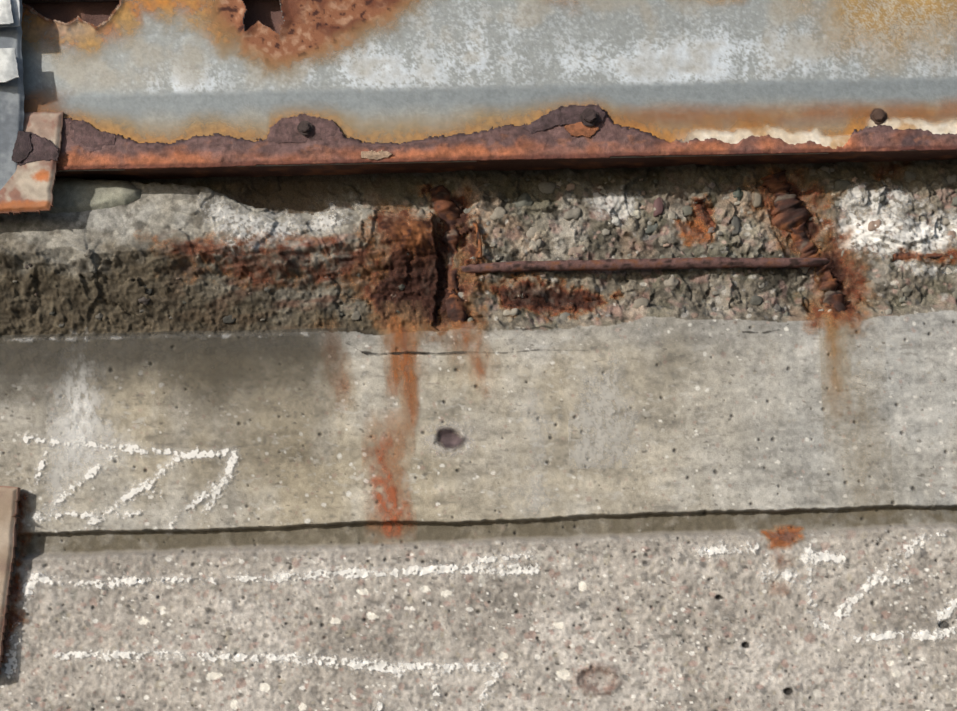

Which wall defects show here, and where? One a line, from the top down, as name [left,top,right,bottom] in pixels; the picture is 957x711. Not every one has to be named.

rust [21,0,420,71]
rust [24,95,957,171]
peeling [688,125,851,149]
peeling [869,119,957,135]
spalling [124,159,957,331]
rust [677,196,715,246]
rust [751,167,867,353]
damp [832,189,957,255]
rust [900,248,957,263]
rust [172,187,622,422]
rust [371,431,404,535]
rust [761,526,803,548]